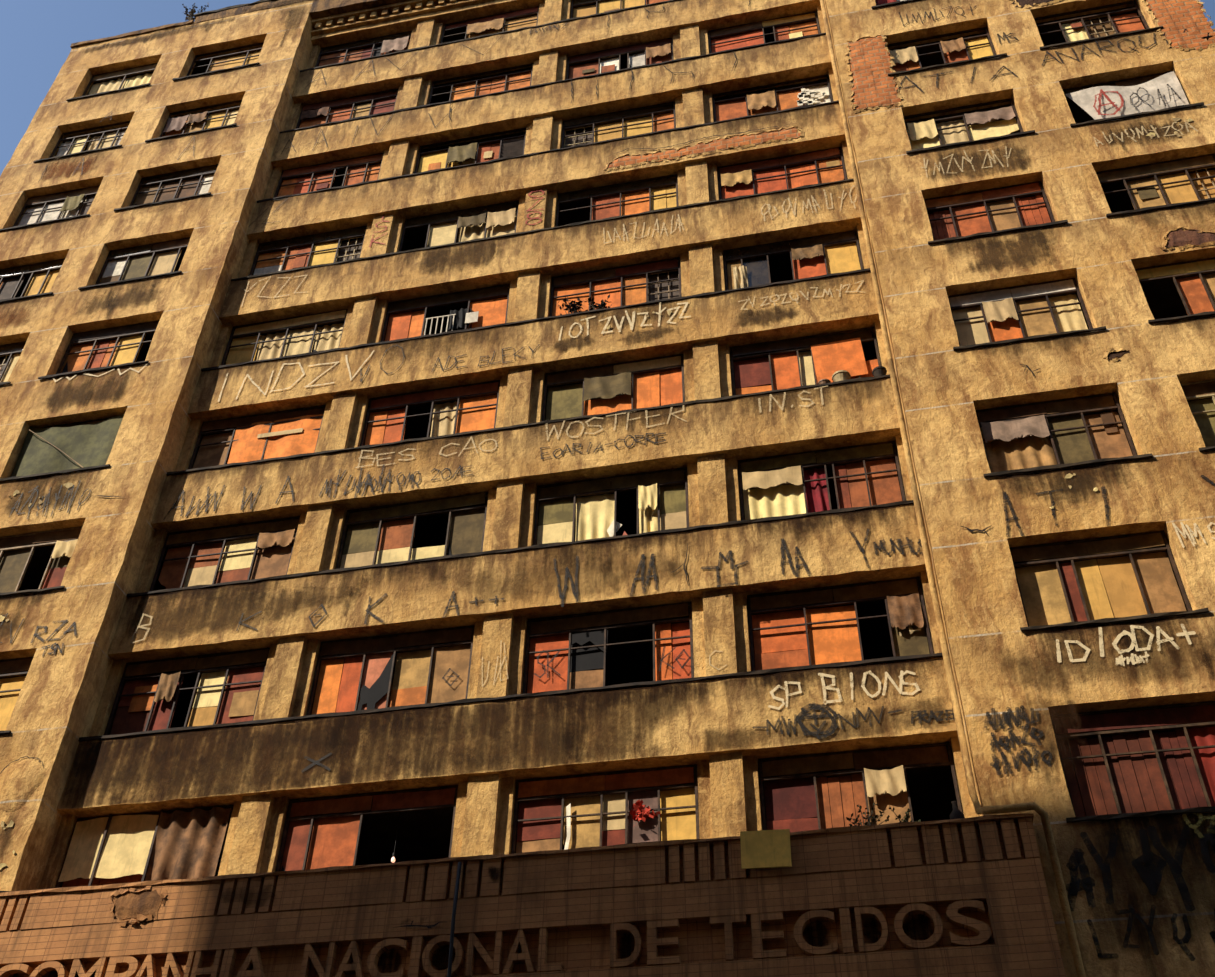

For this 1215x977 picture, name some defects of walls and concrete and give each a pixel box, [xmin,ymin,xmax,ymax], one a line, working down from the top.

flaking render [1012,0,1063,8]
flaking render [1141,0,1215,51]
flaking render [844,34,903,113]
flaking render [603,126,804,172]
flaking render [1160,226,1215,250]
water stain [99,726,240,743]
water stain [296,704,462,725]
flaking render [107,885,168,926]